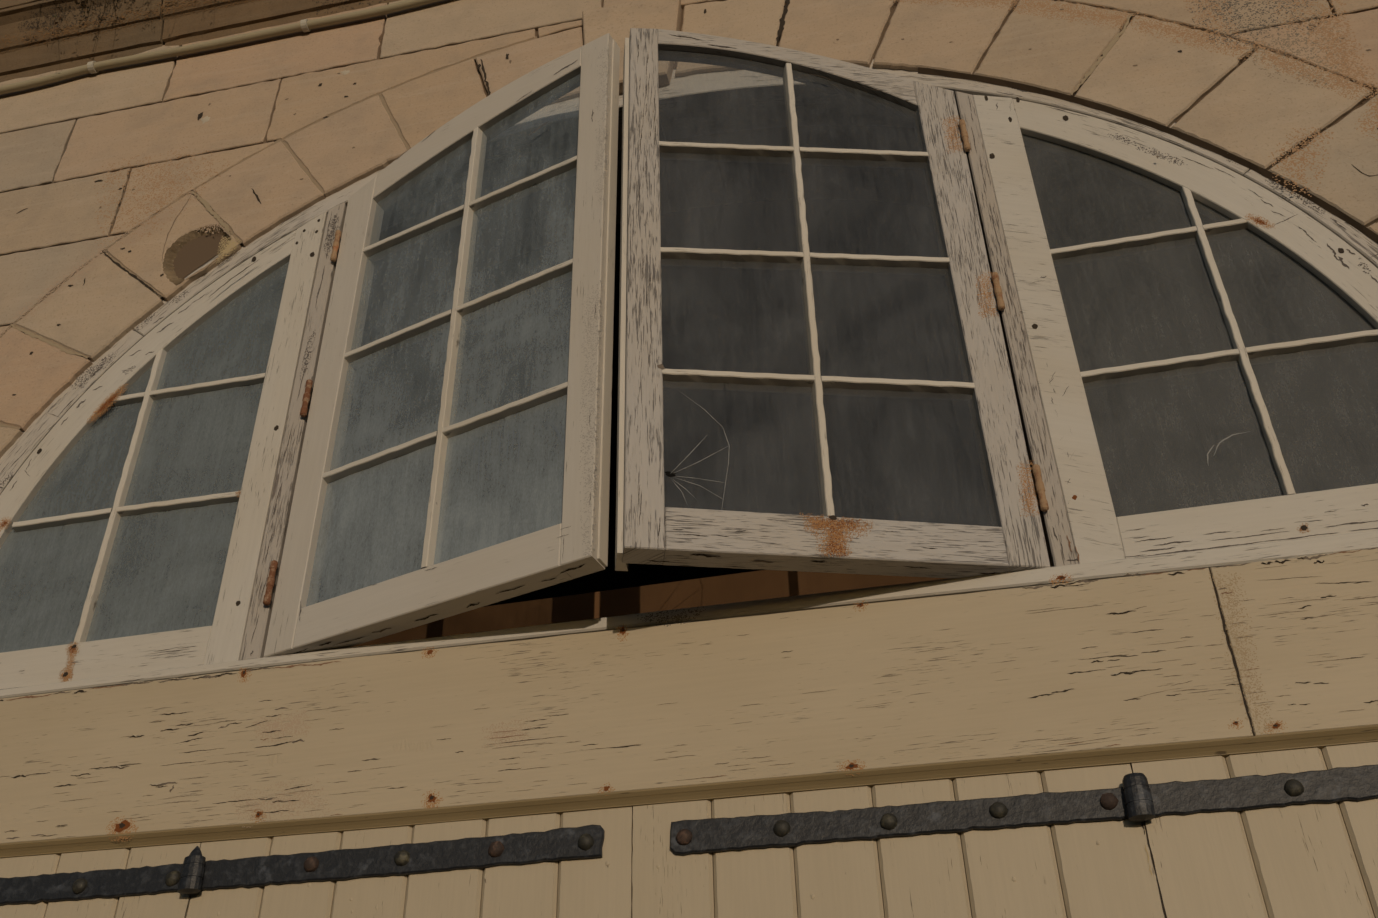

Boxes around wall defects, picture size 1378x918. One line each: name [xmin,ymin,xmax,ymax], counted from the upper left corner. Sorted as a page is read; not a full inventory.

rust [799,513,873,557]
peeling [121,575,274,686]
rust [58,642,79,682]
peeling [1031,655,1163,698]
peeling [161,707,304,748]
peeling [57,763,142,787]